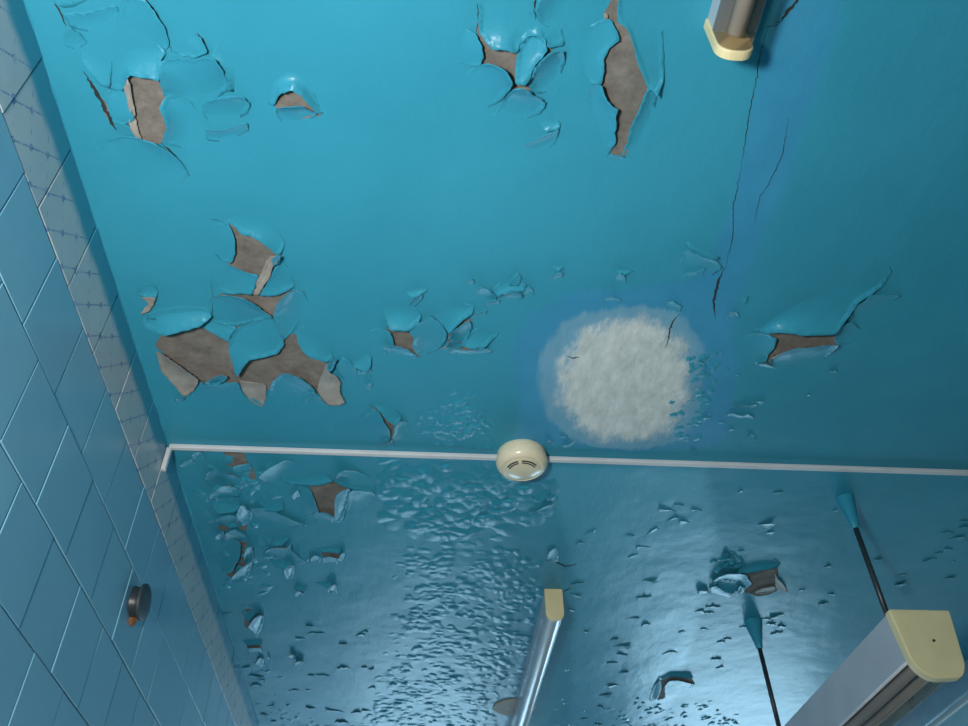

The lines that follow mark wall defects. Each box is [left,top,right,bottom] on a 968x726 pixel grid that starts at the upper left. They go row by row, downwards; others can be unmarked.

peeling [55,0,250,183]
peeling [268,72,323,122]
peeling [459,0,566,150]
peeling [581,0,664,162]
crack [712,0,799,314]
peeling [137,214,373,407]
peeling [369,273,533,359]
peeling [742,266,902,369]
peeling [361,404,409,446]
peeling [204,452,377,597]
peeling [696,553,804,614]
peeling [649,671,695,702]